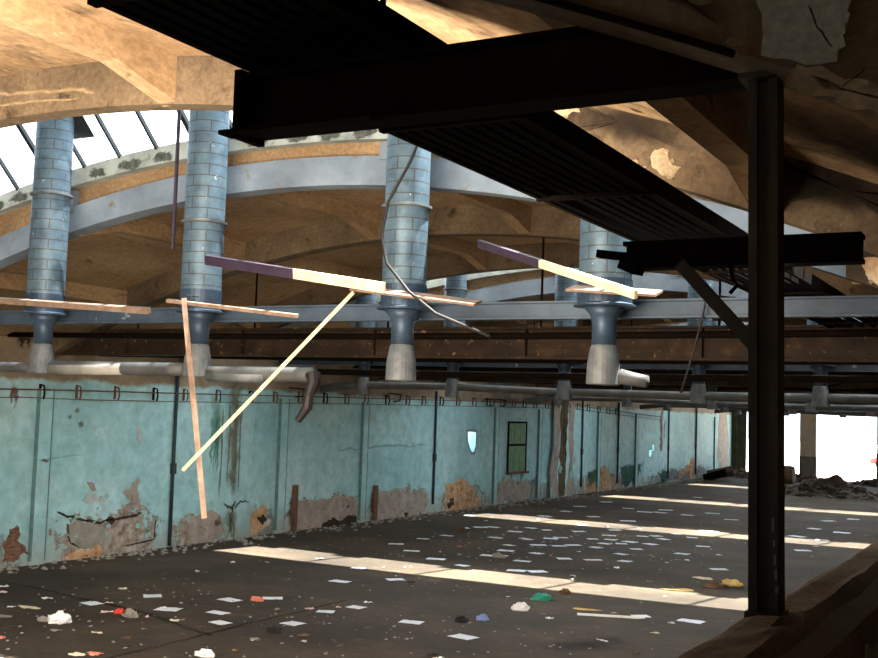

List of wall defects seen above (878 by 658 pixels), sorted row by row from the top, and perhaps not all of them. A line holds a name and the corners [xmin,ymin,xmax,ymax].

crack [809,6,832,47]
spalling [785,64,878,119]
crack [814,68,878,98]
spalling [633,148,681,179]
spalling [862,257,878,285]
water stain [209,383,242,492]
flaking render [285,401,625,530]
flaking render [0,525,28,569]
crack [58,512,156,547]
peeling [49,478,226,561]
spalling [250,504,271,536]